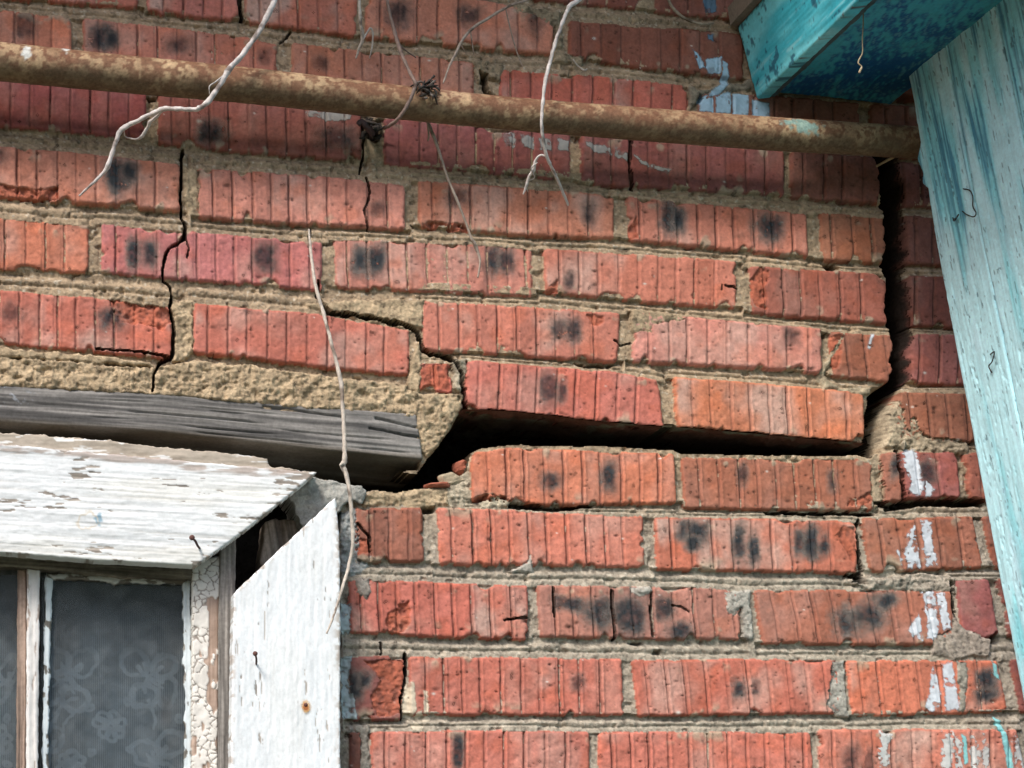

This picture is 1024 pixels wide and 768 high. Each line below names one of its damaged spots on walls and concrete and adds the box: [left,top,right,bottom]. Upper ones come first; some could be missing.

crack [36,141,97,231]
crack [330,117,376,232]
crack [626,140,634,192]
crack [96,133,199,392]
crack [306,157,994,721]
spalling [365,660,404,717]
crack [817,654,929,762]